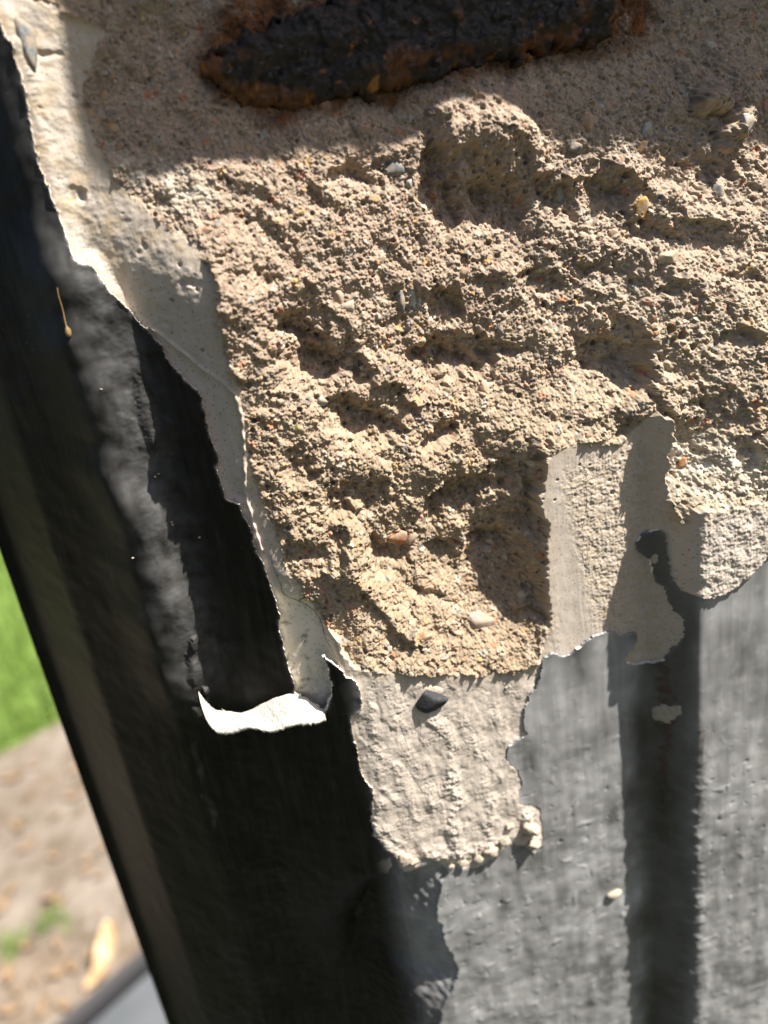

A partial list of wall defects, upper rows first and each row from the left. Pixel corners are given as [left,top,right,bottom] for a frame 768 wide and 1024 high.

rust [197,0,326,62]
rust [535,0,654,61]
spalling [0,0,768,709]
peeling [652,704,682,724]
peeling [337,639,543,873]